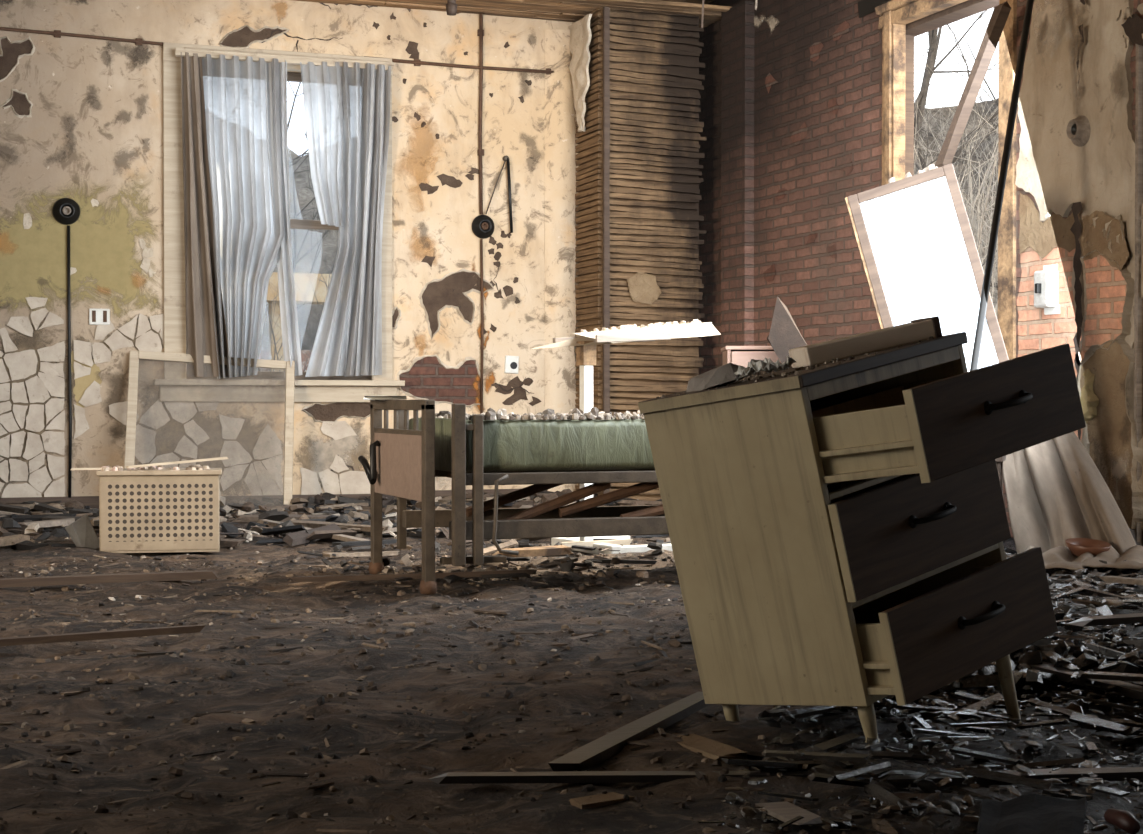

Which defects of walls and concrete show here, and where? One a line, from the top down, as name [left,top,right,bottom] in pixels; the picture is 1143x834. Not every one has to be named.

flaking render [218,25,289,48]
flaking render [0,36,35,118]
peeling [419,167,479,194]
peeling [488,231,512,267]
flaking render [419,256,520,340]
flaking render [397,354,542,409]
flaking render [1017,193,1143,531]